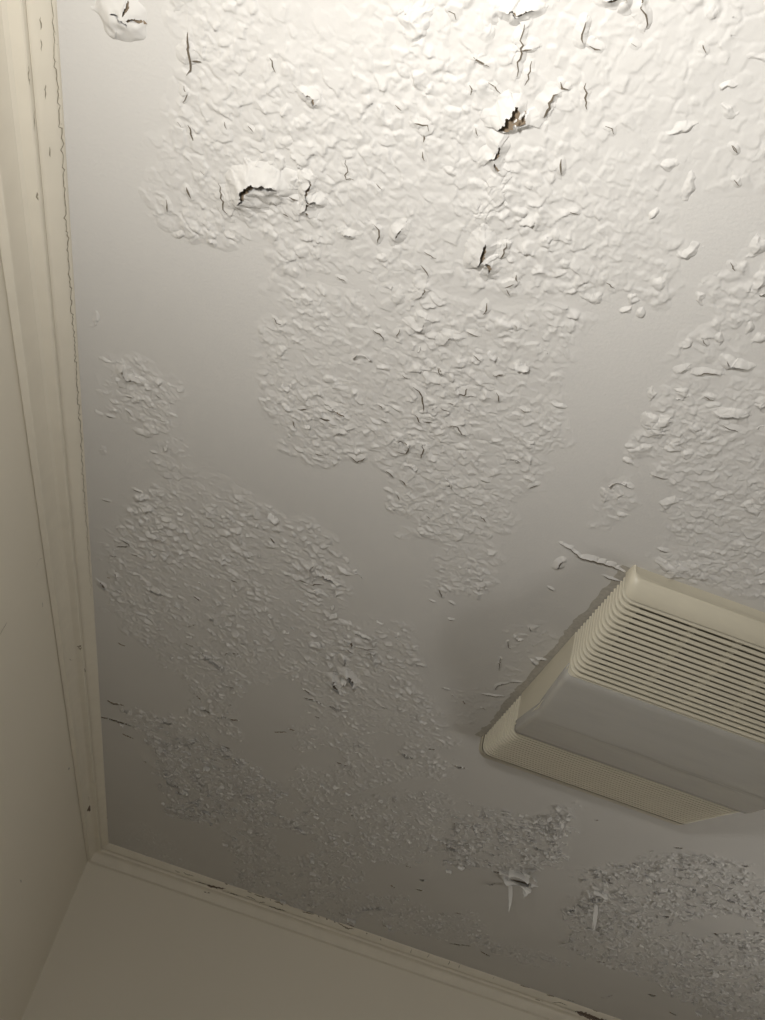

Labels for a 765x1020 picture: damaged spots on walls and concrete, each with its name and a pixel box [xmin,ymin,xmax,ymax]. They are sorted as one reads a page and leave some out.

peeling [90,0,147,42]
peeling [498,0,549,26]
peeling [593,0,633,16]
peeling [293,84,327,110]
peeling [477,89,549,177]
peeling [221,157,328,224]
peeling [335,225,360,240]
peeling [388,218,411,249]
peeling [463,227,502,282]
peeling [402,279,466,348]
peeling [718,353,757,372]
peeling [491,869,538,910]